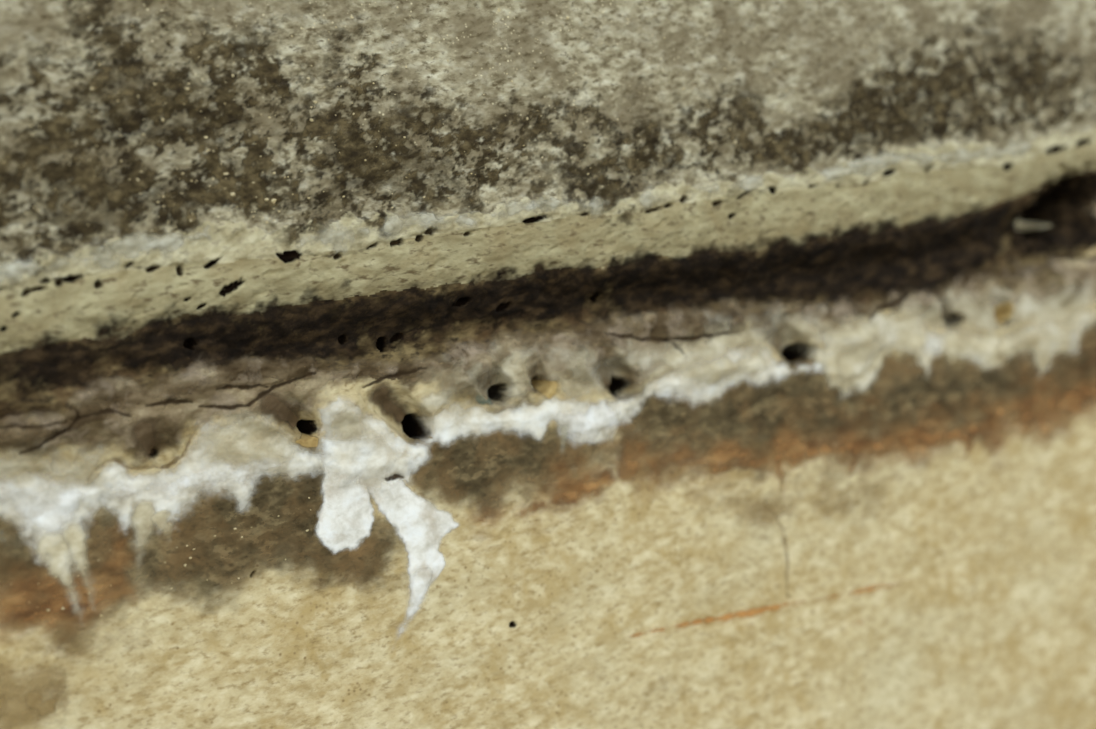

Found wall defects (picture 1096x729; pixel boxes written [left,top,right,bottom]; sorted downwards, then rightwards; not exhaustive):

water stain [0,0,1096,281]
crack [1045,139,1090,154]
crack [645,196,686,213]
crack [712,187,776,206]
crack [523,215,546,224]
crack [367,229,434,249]
crack [276,250,301,263]
crack [125,258,219,276]
crack [22,275,102,297]
crack [606,331,738,354]
water stain [0,256,1096,617]
rust [677,603,794,627]